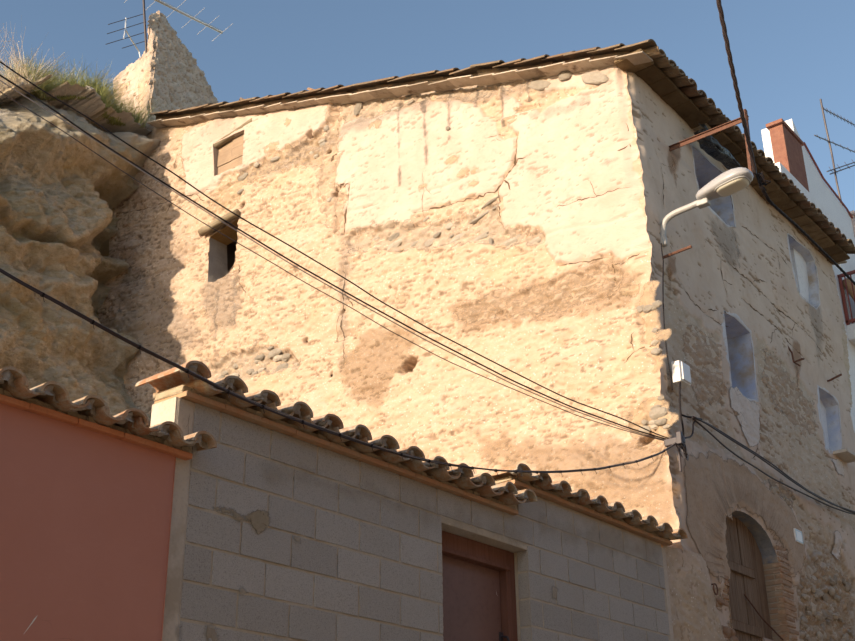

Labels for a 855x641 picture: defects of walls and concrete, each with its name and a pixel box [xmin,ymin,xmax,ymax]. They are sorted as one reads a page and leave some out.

crack [415,135,526,218]
crack [558,180,628,206]
crack [336,267,353,366]